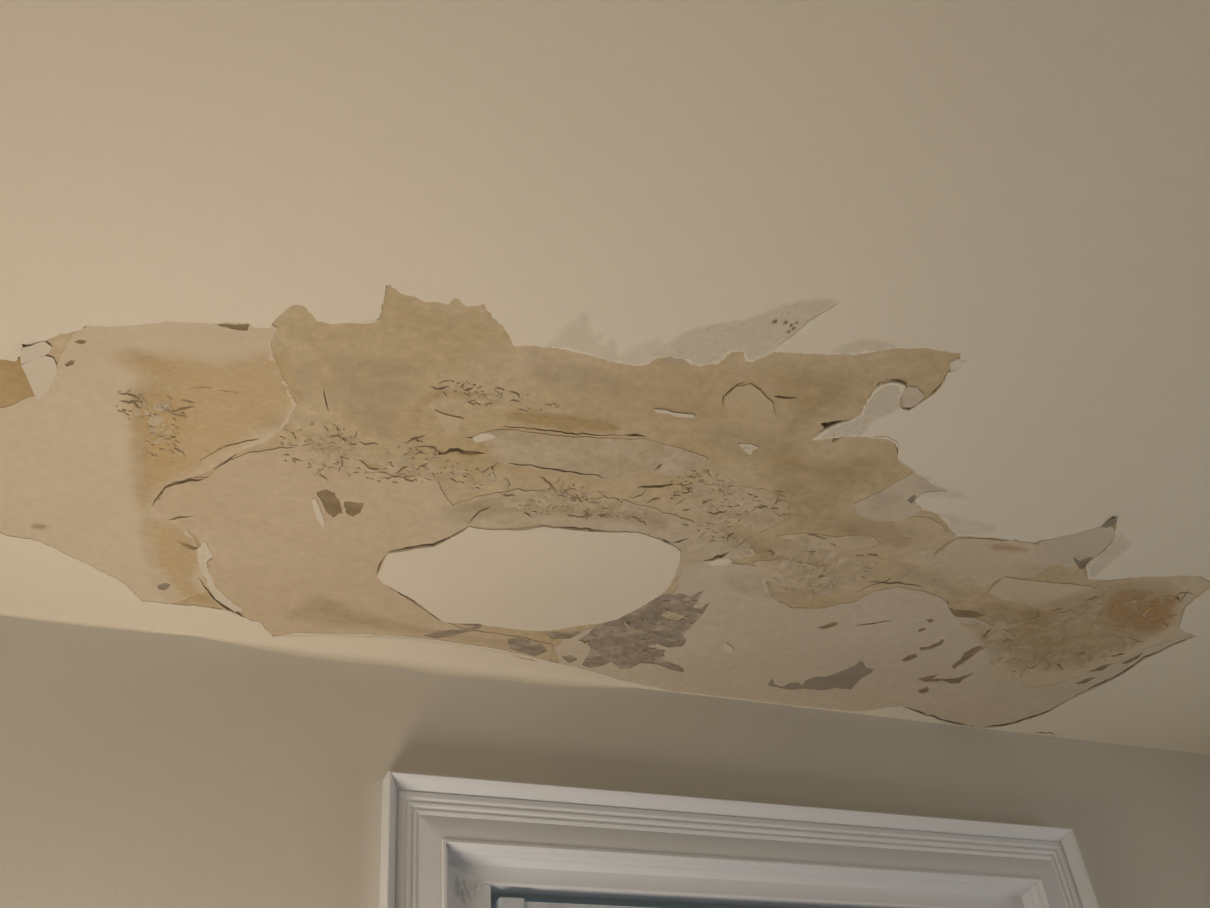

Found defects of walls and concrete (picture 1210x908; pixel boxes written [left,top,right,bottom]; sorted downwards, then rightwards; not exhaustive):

peeling [0,285,1210,728]